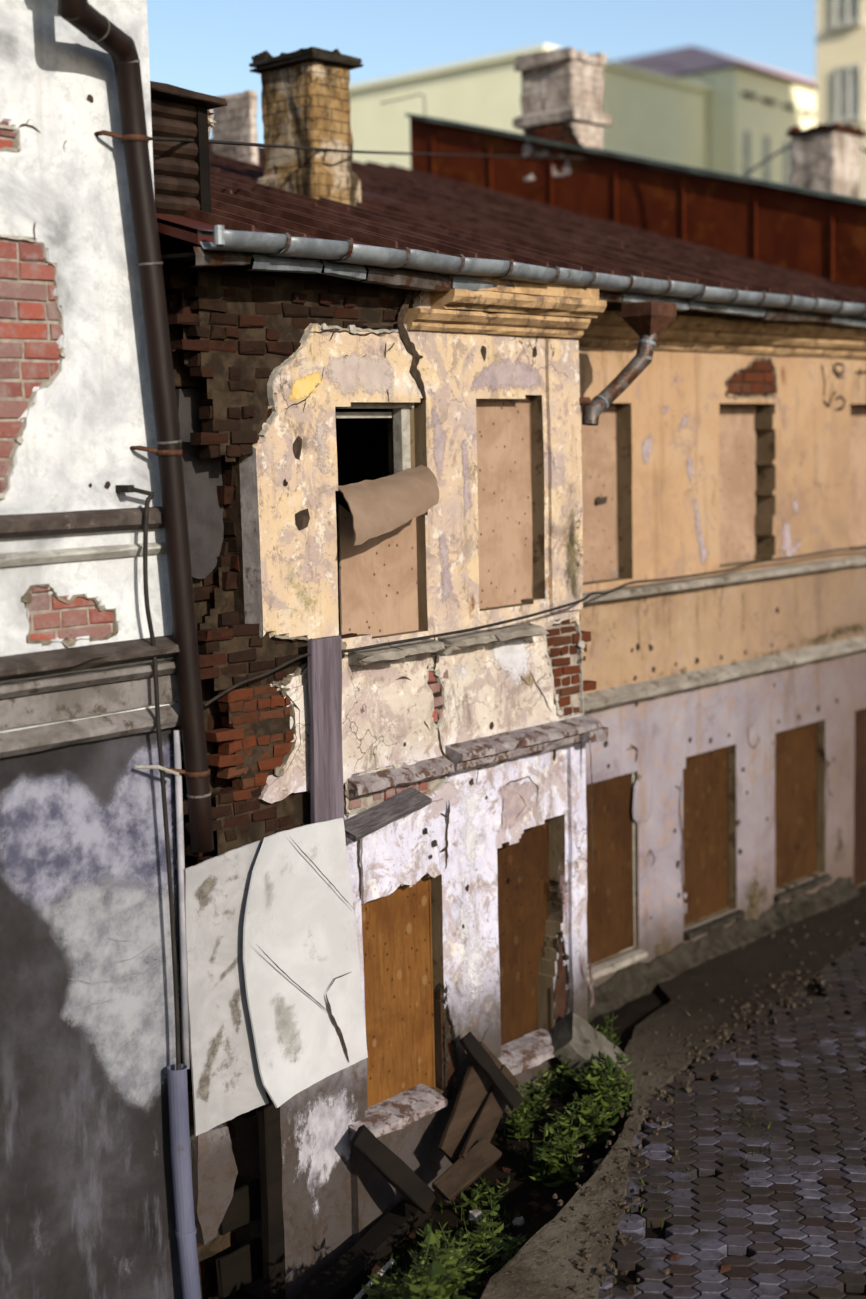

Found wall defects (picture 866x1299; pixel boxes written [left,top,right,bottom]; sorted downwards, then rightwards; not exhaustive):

flaking render [0,121,21,152]
crack [286,289,426,412]
flaking render [719,357,777,405]
peeling [0,235,424,1125]
flaking render [426,665,466,729]
peeling [492,639,533,686]
flaking render [544,615,597,720]
flaking render [343,763,448,819]
peeling [485,780,534,829]
crack [257,945,351,1062]
spalling [222,1108,256,1151]
spalling [197,1229,237,1299]